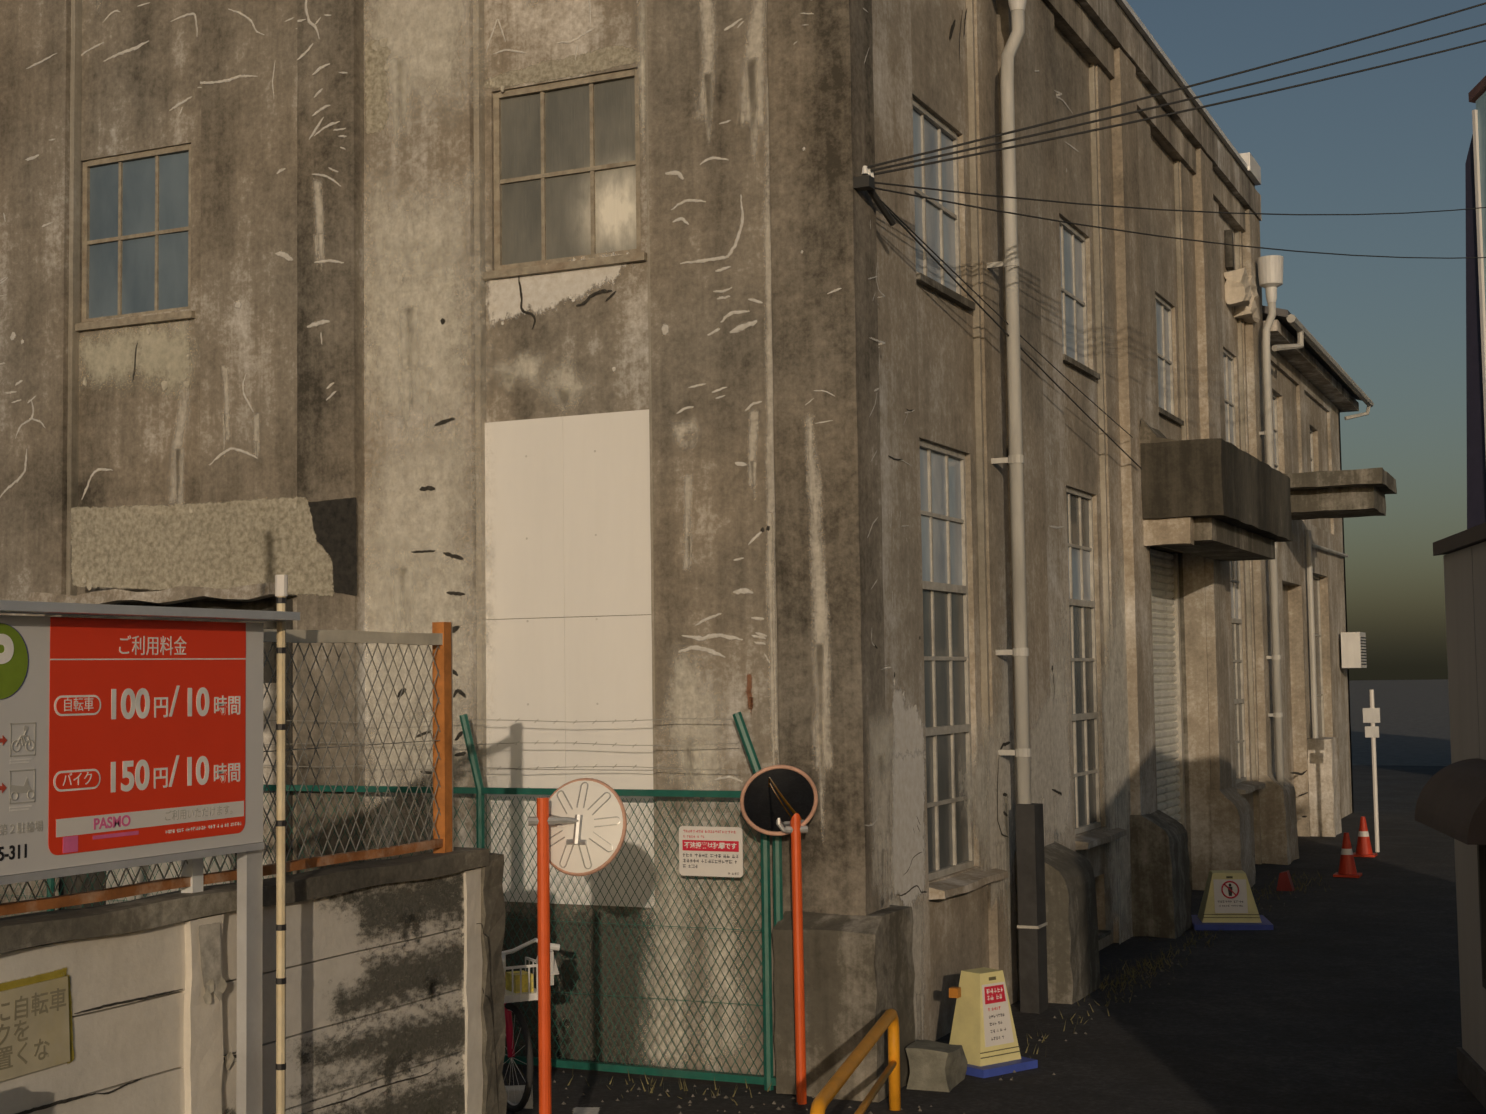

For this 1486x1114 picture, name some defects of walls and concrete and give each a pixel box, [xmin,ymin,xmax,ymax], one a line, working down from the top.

crack [518,277,536,329]
peeling [485,253,628,326]
crack [576,289,616,306]
mould [291,869,470,1114]